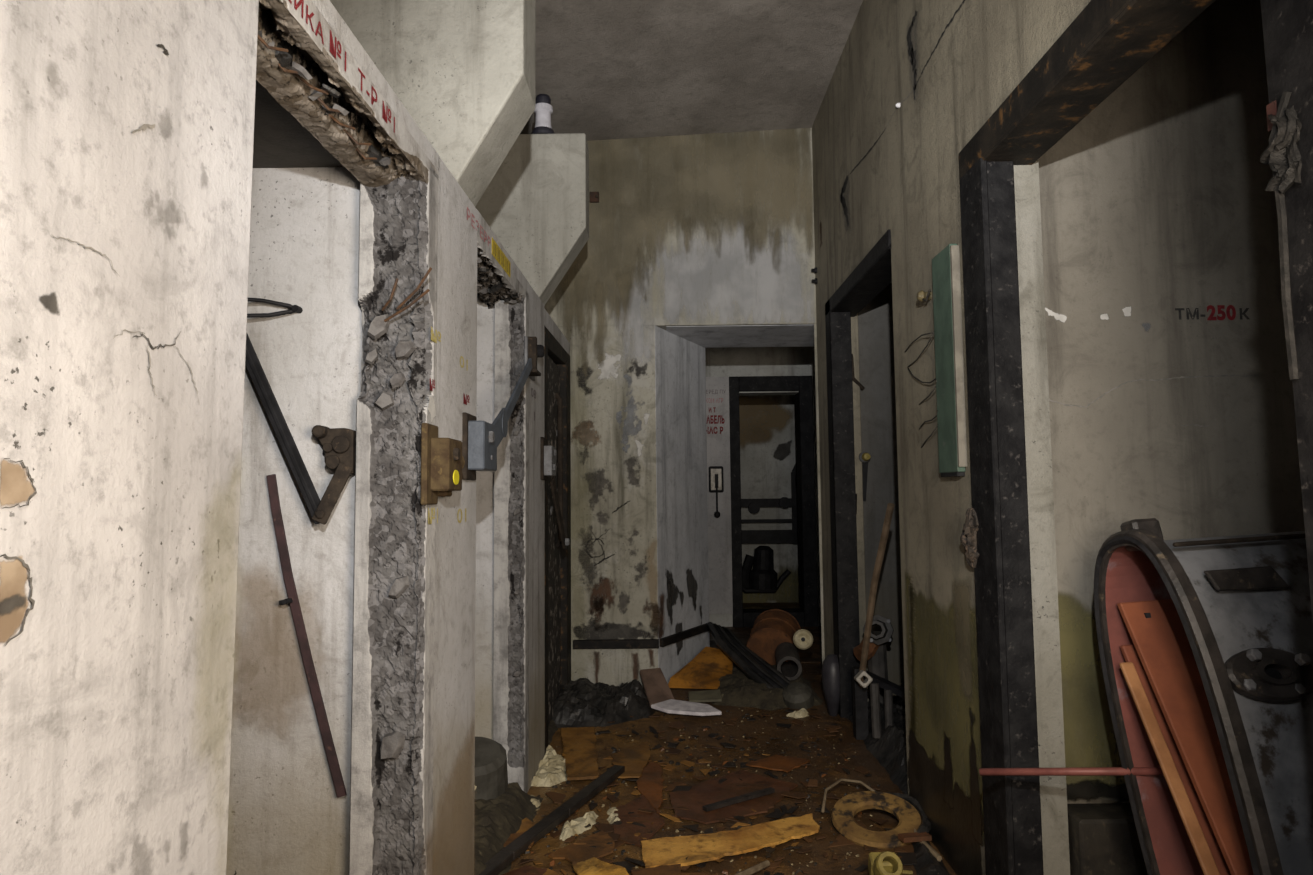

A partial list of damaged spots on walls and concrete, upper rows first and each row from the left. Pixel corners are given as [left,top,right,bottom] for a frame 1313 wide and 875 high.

peeling [0,554,35,646]
peeling [0,458,37,509]
crack [113,329,200,405]
spalling [256,0,440,875]
spalling [477,227,529,793]
peeling [665,569,702,655]
water stain [561,128,812,395]
water stain [905,575,984,846]